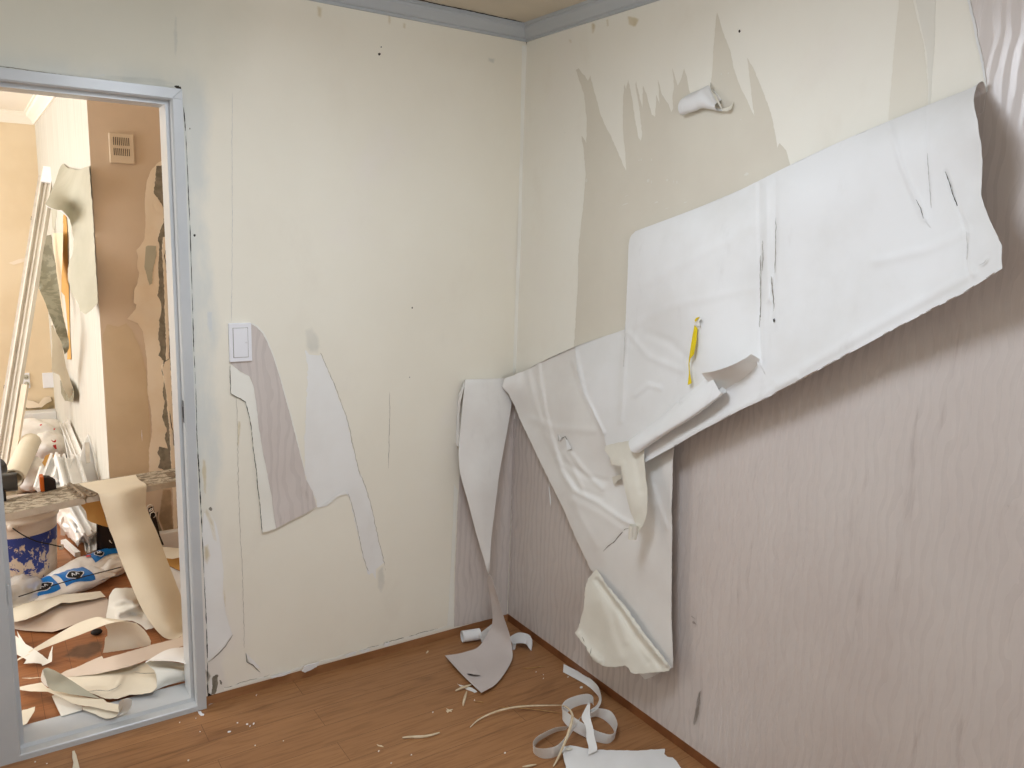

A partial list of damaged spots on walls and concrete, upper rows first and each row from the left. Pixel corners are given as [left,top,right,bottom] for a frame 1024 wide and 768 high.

flaking render [103,161,175,478]
flaking render [157,487,178,531]
peeling [230,323,387,597]
peeling [574,14,790,347]